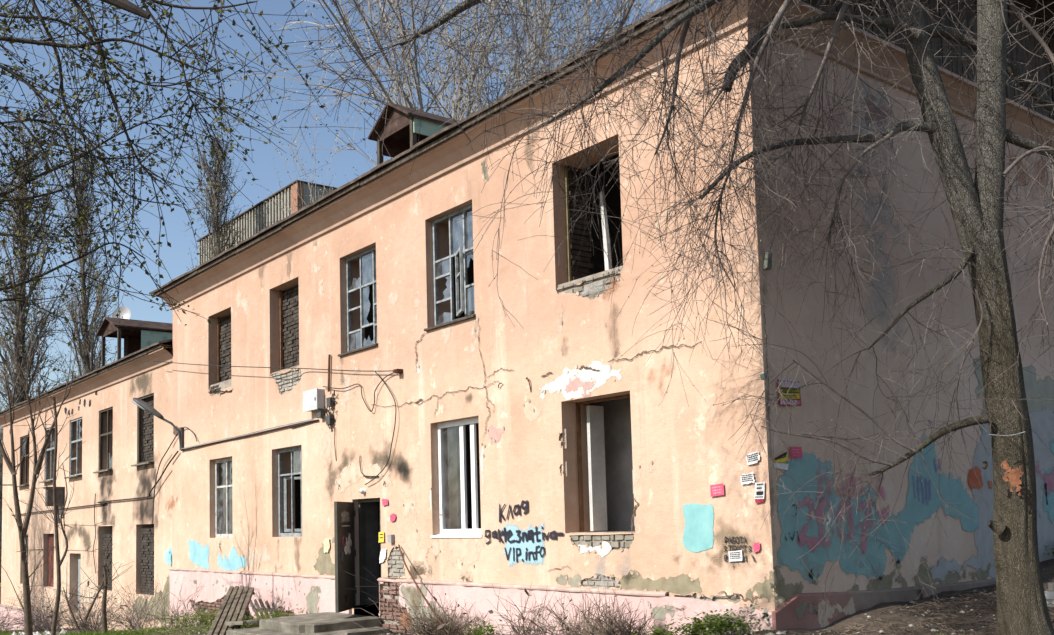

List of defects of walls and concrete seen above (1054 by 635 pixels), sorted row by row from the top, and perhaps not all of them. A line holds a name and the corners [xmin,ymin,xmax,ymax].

spalling [556,266,623,299]
crack [579,341,702,374]
spalling [271,365,301,395]
crack [371,325,514,438]
peeling [523,360,622,422]
leakage [374,453,408,478]
spalling [569,531,635,557]
spalling [378,492,486,635]
flaking render [555,570,771,635]
peeling [817,595,856,628]